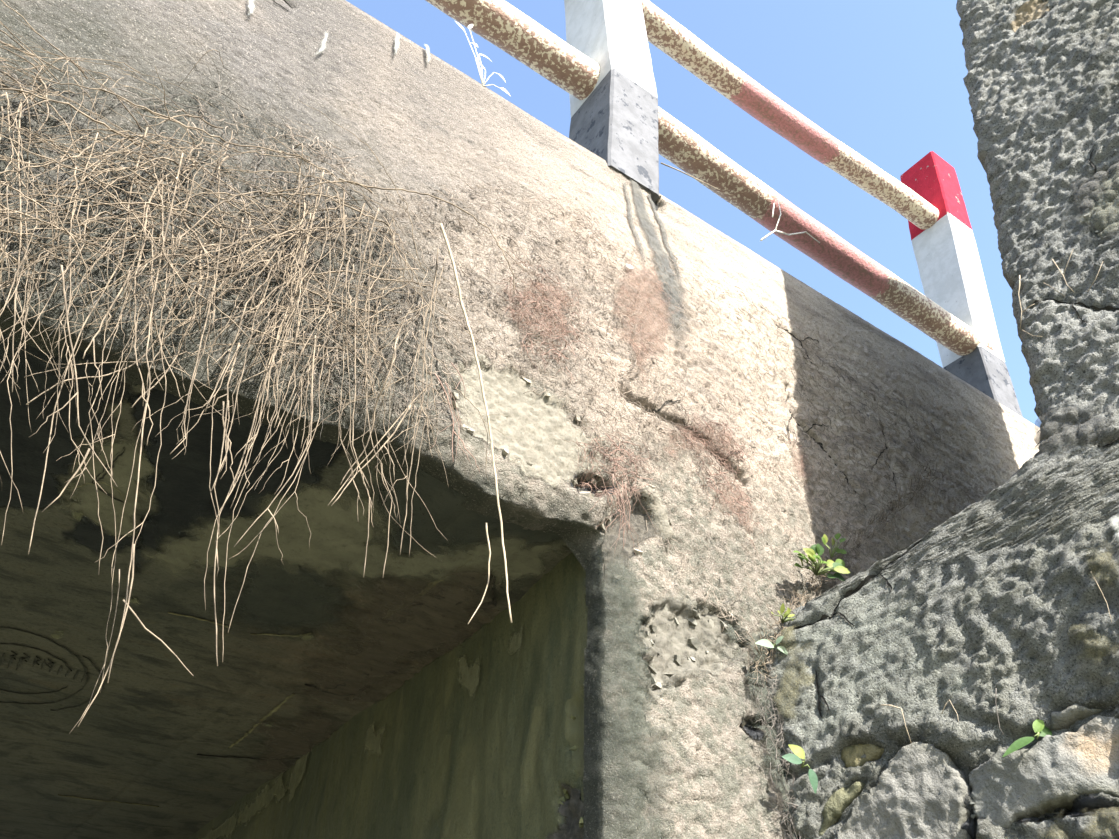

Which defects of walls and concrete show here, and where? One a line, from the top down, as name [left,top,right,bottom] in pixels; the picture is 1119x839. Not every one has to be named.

crack [1030,299,1119,324]
crack [626,400,741,464]
damp [218,558,354,640]